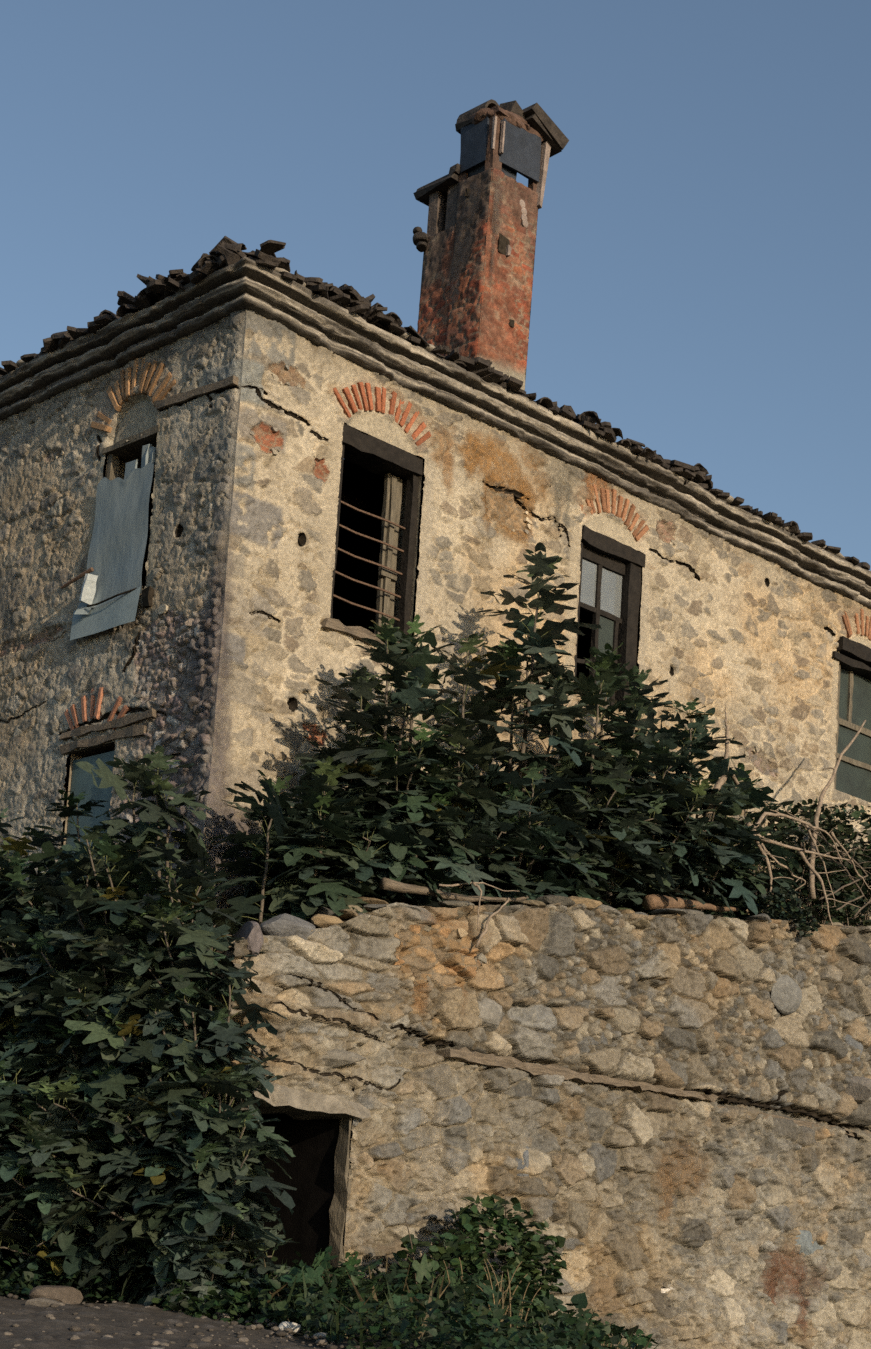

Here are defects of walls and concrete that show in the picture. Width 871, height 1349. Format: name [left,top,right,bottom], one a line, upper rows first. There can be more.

crack [159,385,329,441]
crack [482,481,571,547]
crack [649,548,700,581]
leakage [148,569,252,893]
crack [683,1089,870,1140]